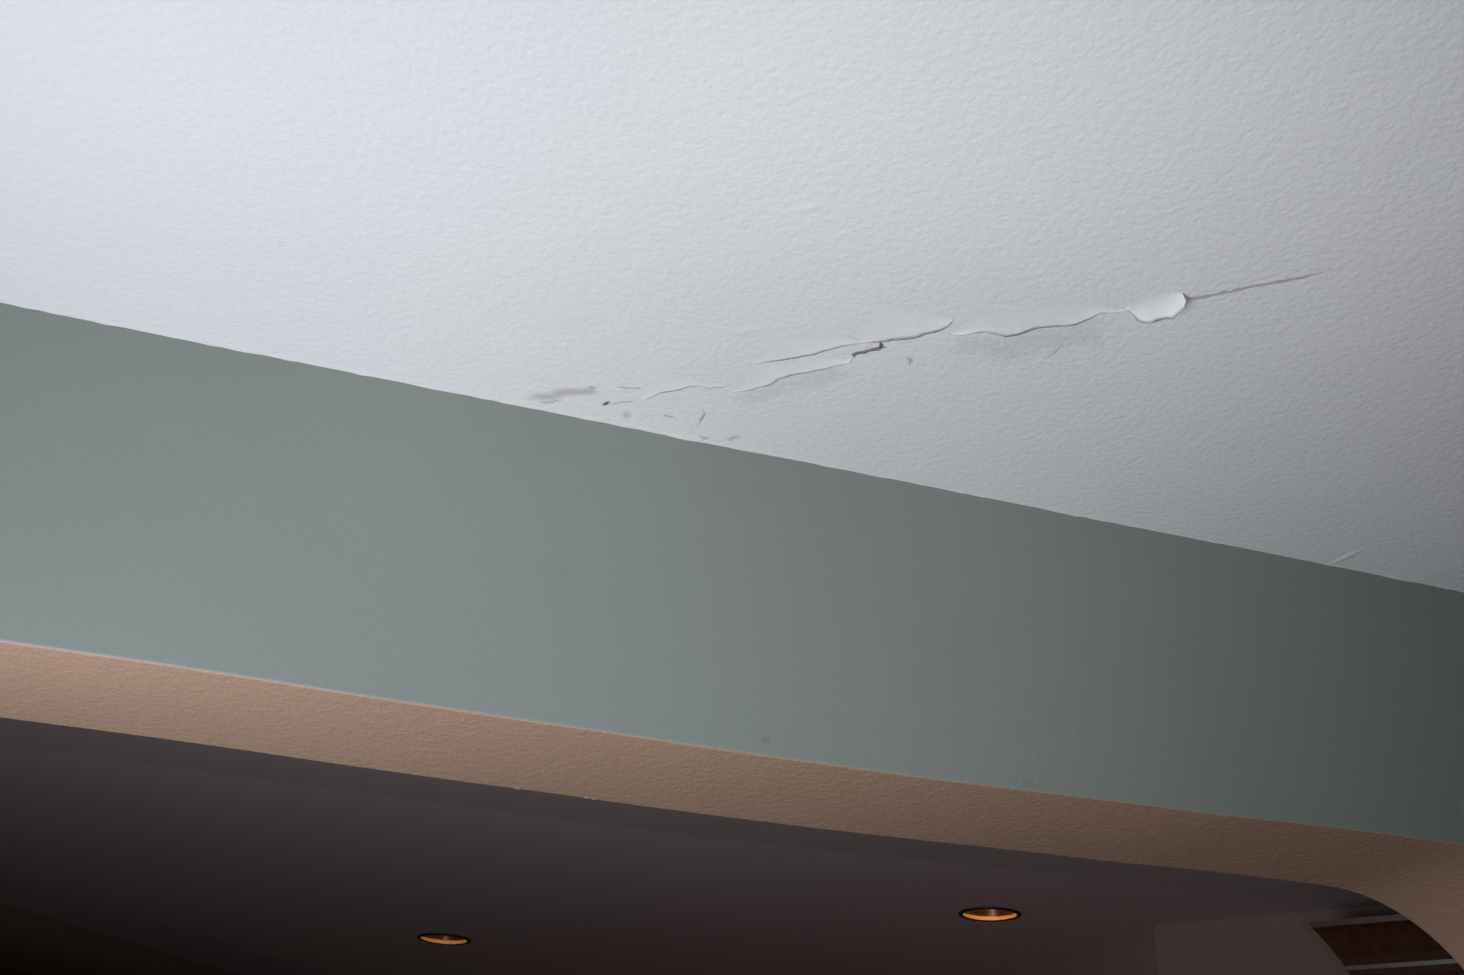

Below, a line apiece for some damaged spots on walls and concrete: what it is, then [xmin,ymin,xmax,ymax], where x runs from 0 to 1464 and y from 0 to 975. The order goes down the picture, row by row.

peeling [637,292,1186,402]